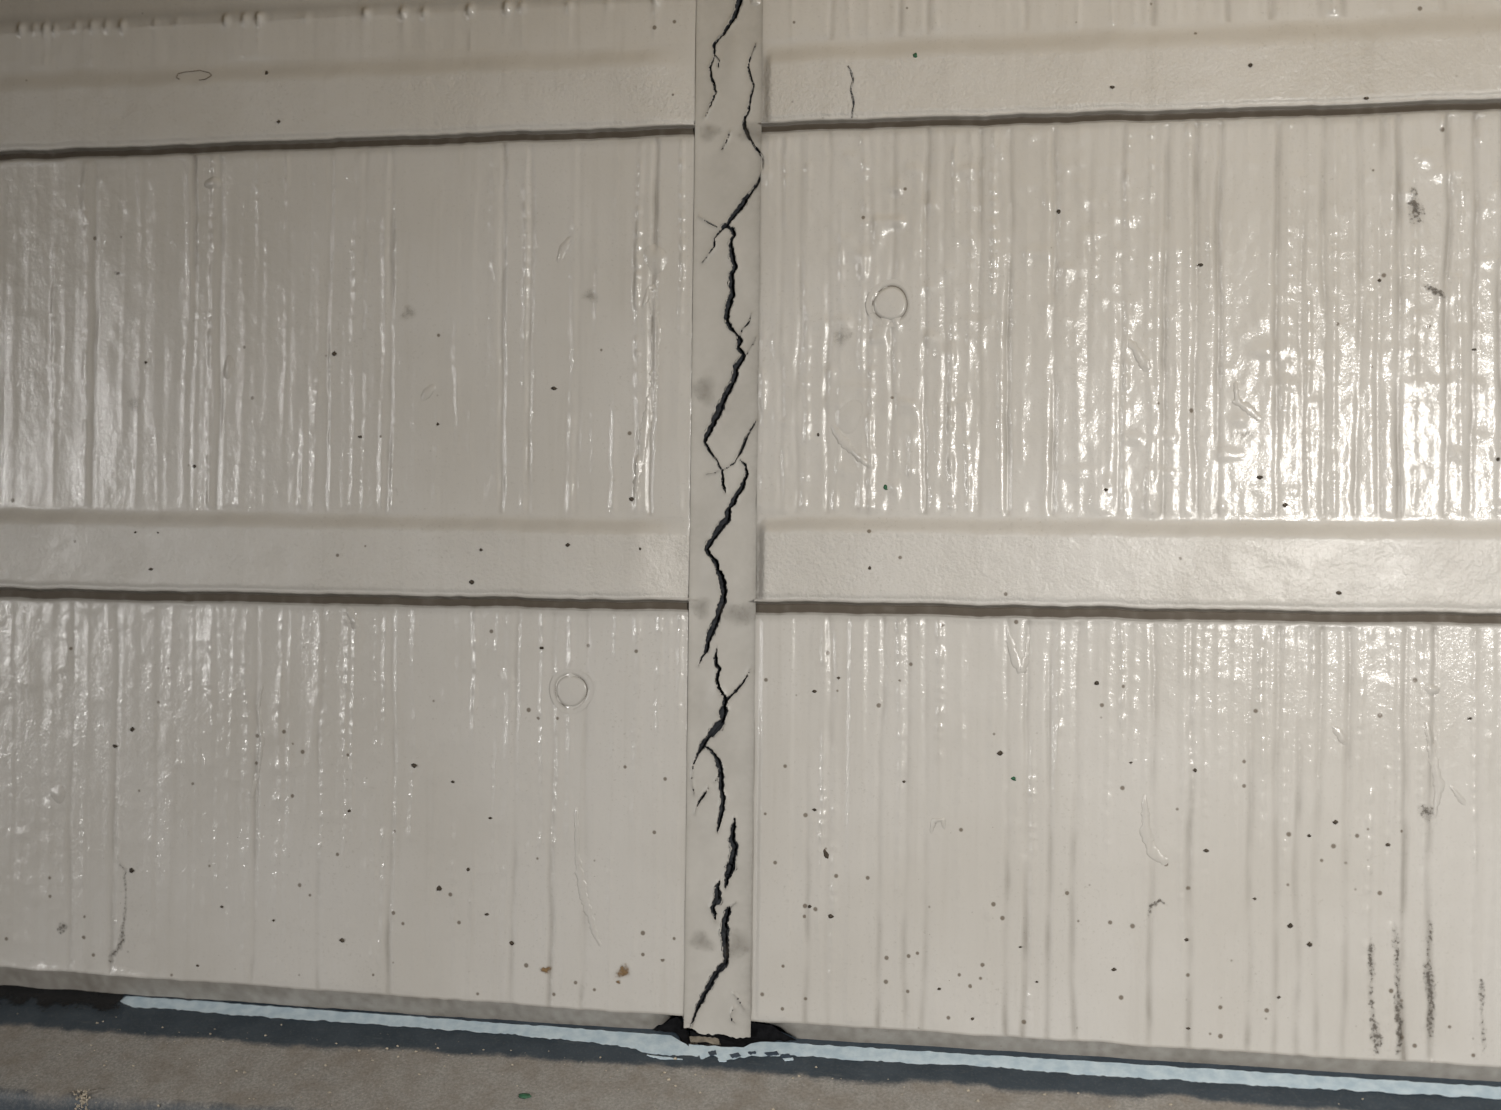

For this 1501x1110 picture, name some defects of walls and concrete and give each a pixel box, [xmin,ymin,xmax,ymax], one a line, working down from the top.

crack [691,0,763,1029]